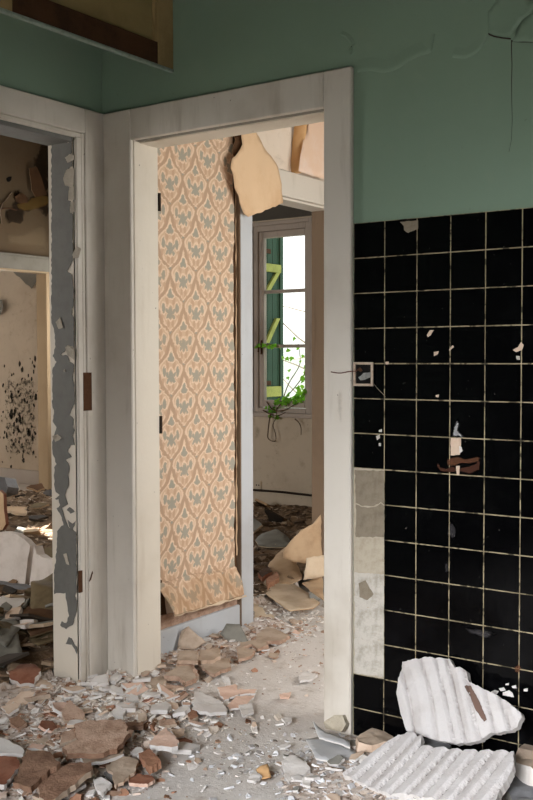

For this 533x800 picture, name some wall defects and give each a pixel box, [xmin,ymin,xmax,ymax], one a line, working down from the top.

peeling [0,142,81,653]